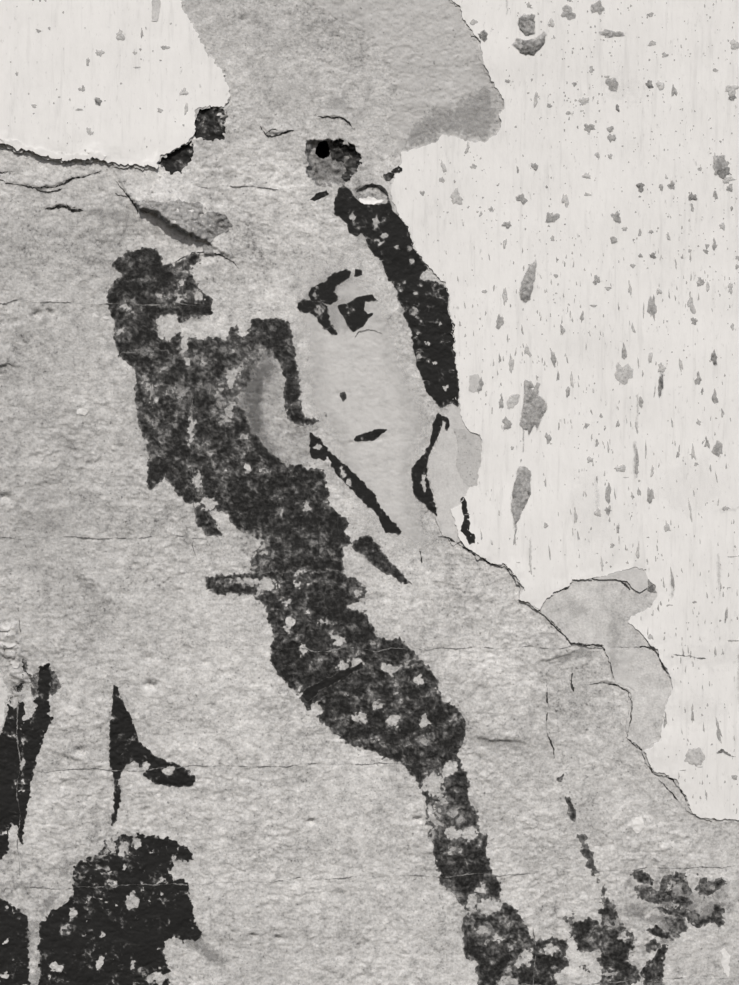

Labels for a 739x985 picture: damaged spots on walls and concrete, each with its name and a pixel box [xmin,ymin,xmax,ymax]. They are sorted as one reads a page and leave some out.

peeling [0,0,231,171]
peeling [310,0,504,155]
crack [0,171,138,214]
spalling [305,139,389,205]
peeling [427,397,482,546]
spalling [0,615,31,703]
crack [278,536,692,812]
peeling [536,567,673,749]
crack [640,646,706,674]